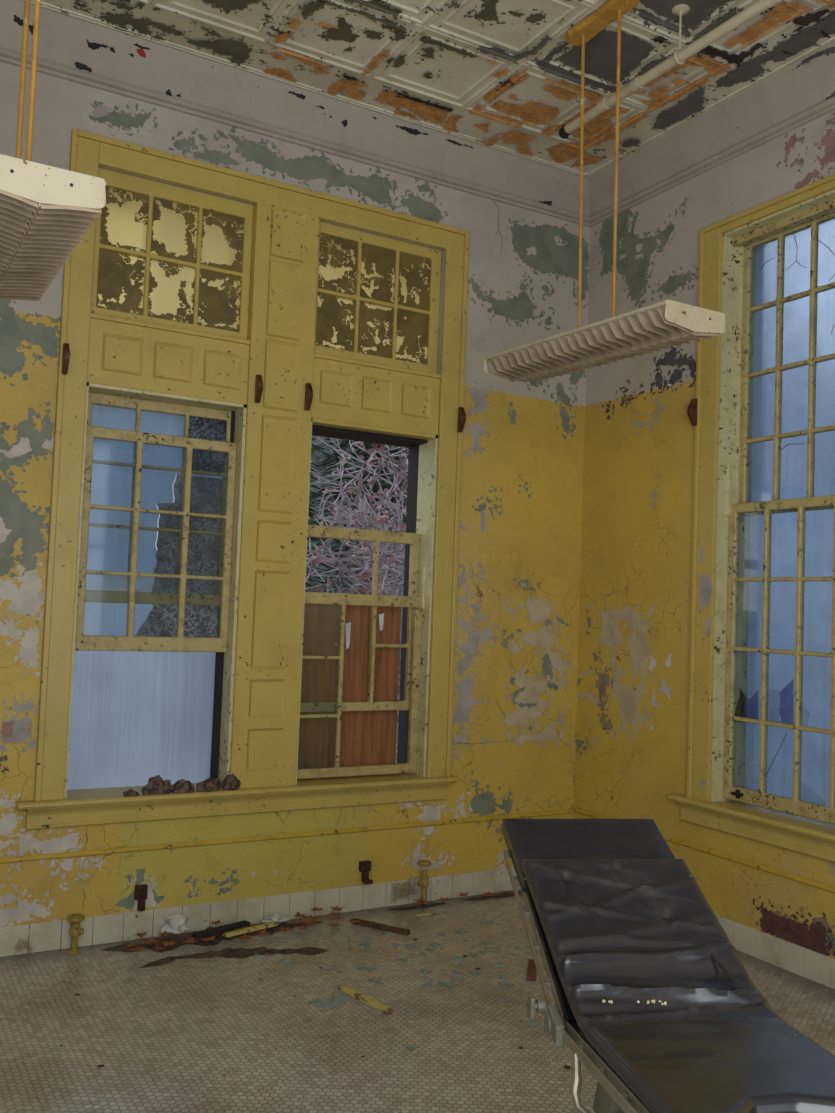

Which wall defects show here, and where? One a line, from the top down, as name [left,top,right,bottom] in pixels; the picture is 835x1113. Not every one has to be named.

peeling [72,0,257,69]
peeling [202,0,279,27]
rust [263,17,731,168]
peeling [288,0,835,132]
rust [724,0,835,48]
peeling [168,127,448,223]
peeling [468,198,697,330]
peeling [0,299,61,386]
peeling [0,401,55,678]
peeling [451,561,672,760]
peeling [397,769,532,876]
flaking render [753,896,835,956]